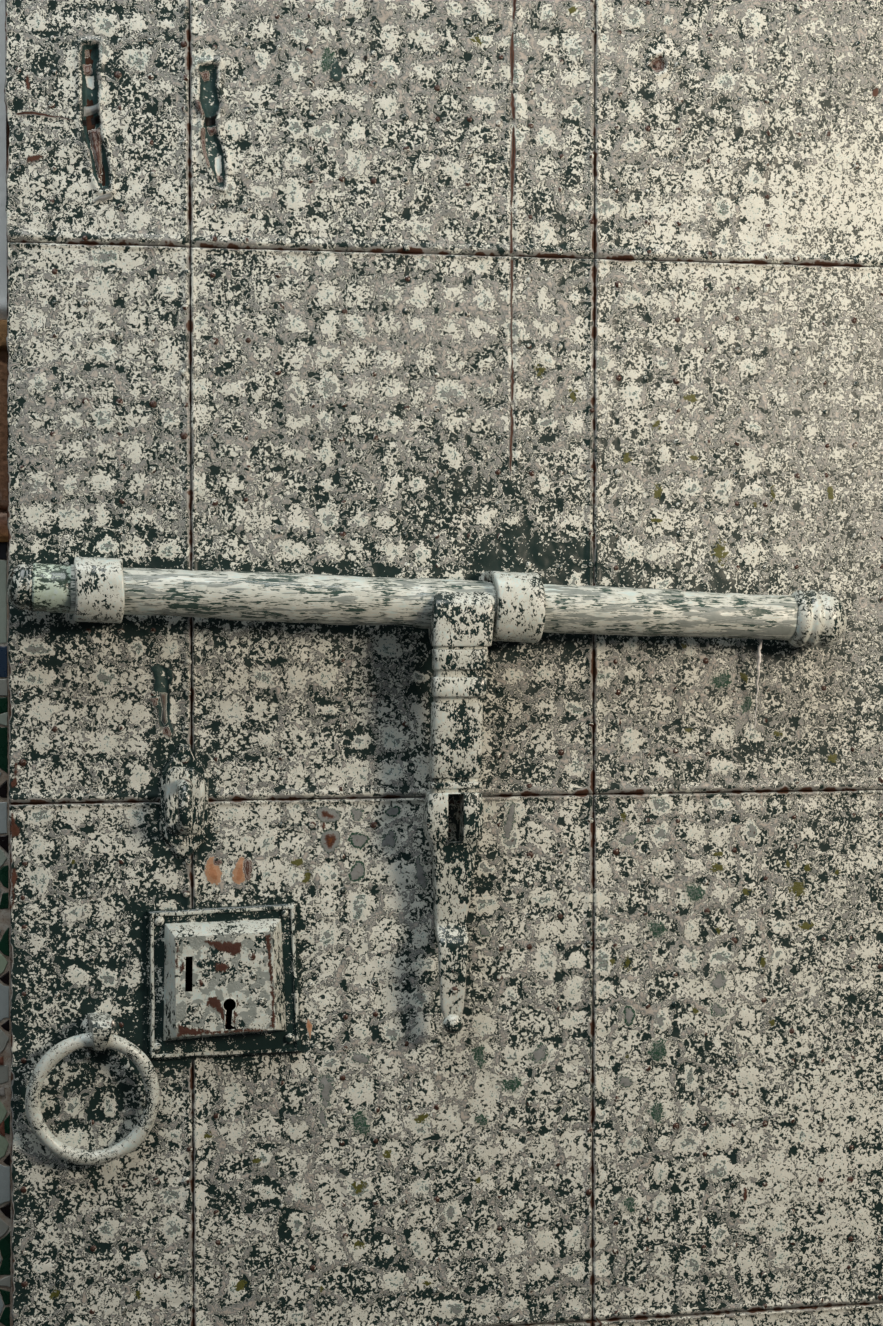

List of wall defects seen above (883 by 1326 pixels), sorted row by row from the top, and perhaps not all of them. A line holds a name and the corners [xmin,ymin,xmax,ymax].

rust [177,934,275,1037]